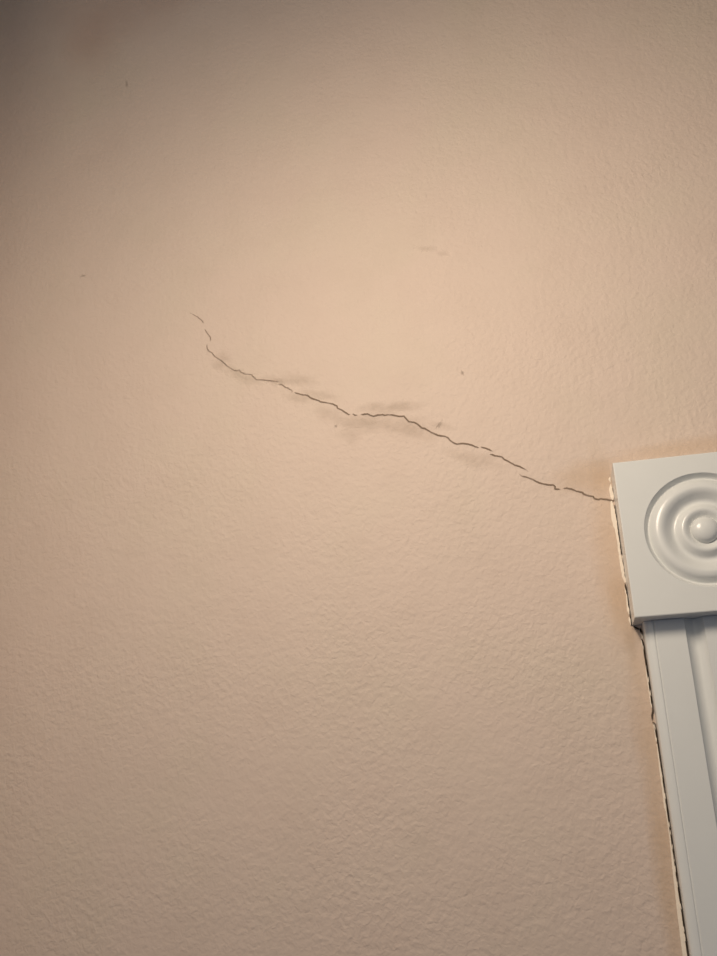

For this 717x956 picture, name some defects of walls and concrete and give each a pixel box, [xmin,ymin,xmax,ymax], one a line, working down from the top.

crack [197,316,689,956]